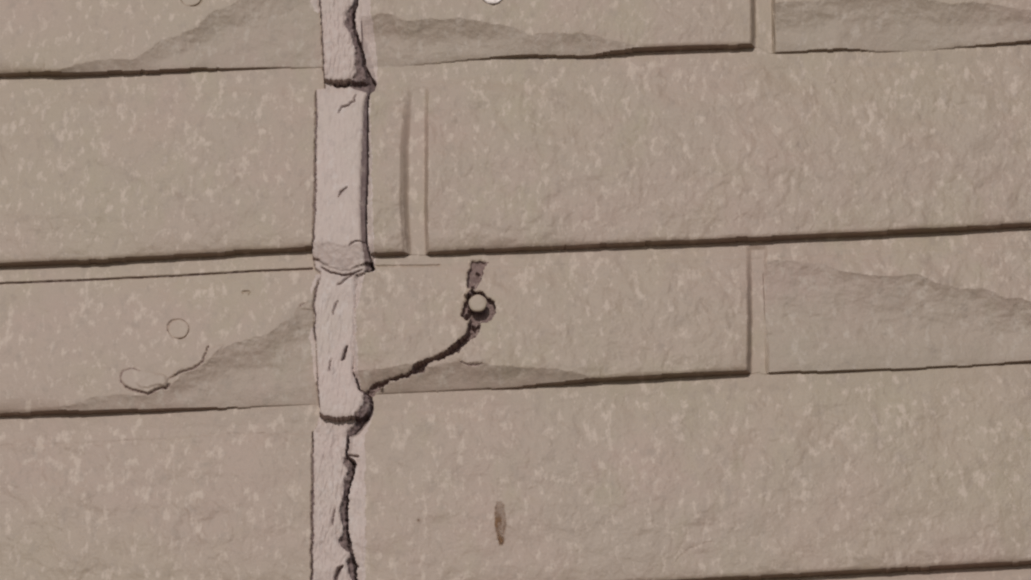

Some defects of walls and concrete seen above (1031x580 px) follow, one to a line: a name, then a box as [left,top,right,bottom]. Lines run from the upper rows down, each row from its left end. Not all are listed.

crack [321,0,377,315]
crack [365,261,496,399]
crack [333,429,360,580]